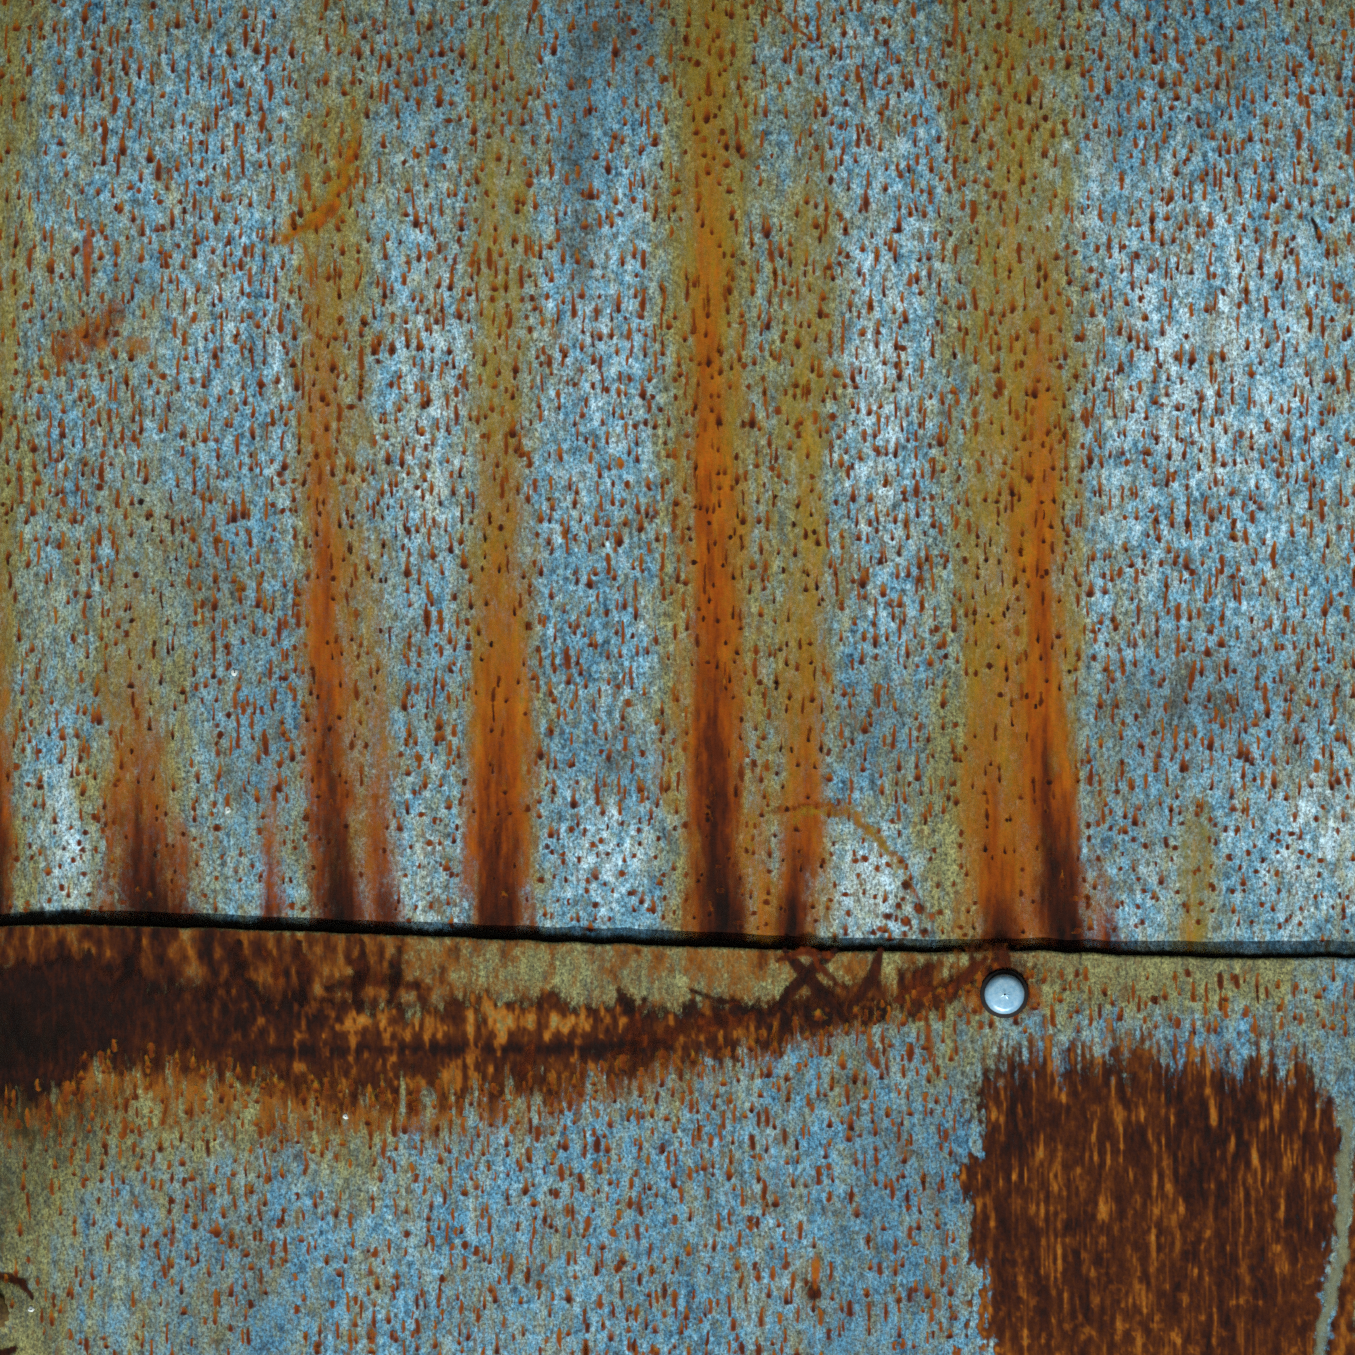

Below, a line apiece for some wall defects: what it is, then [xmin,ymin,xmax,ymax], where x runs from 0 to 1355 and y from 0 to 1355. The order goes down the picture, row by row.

rust [0,19,67,120]
rust [592,96,668,175]
rust [778,0,882,185]
rust [1285,0,1355,172]
rust [1317,186,1355,268]
rust [1189,288,1226,317]
rust [1245,296,1312,410]
rust [1094,479,1139,521]
rust [1322,525,1355,588]
rust [1283,682,1352,801]
rust [556,869,614,932]
rust [1226,812,1350,934]